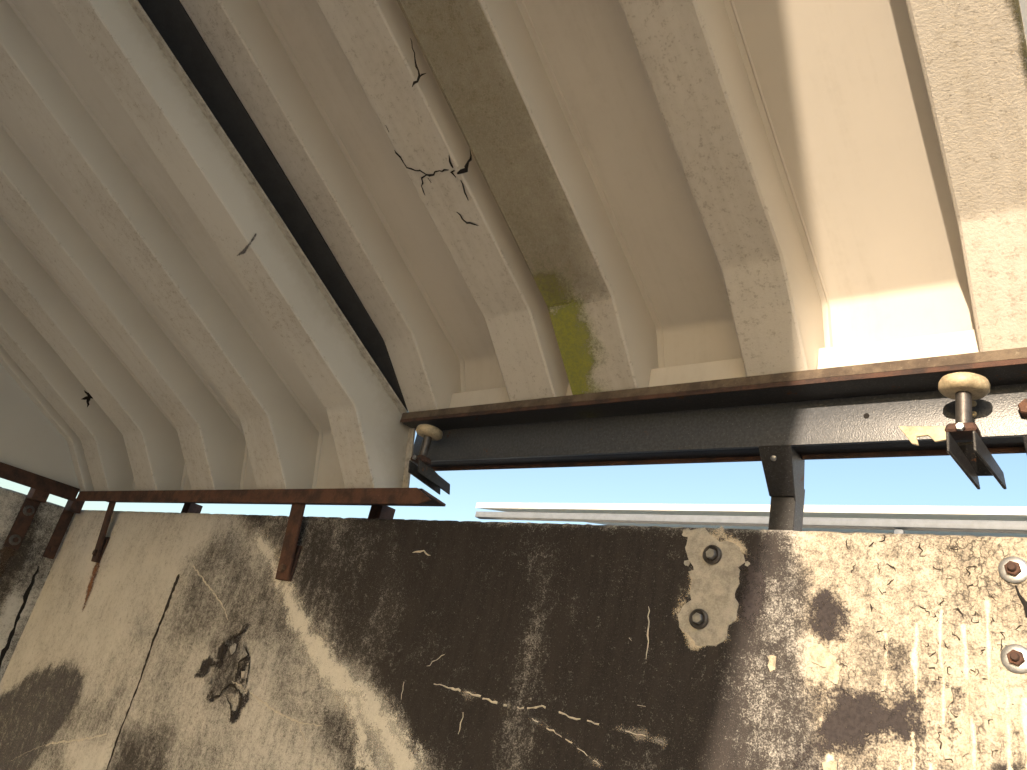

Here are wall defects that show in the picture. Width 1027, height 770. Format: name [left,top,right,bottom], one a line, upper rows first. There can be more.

crack [410,38,426,87]
crack [386,126,479,226]
damp [532,273,598,395]
crack [0,566,39,668]
corrosion [83,563,100,609]
spalling [673,526,750,651]
damp [807,588,851,645]
crack [1015,586,1027,618]
peeling [194,620,250,724]
crack [434,683,664,766]
damp [793,609,978,770]
damp [984,599,1027,770]